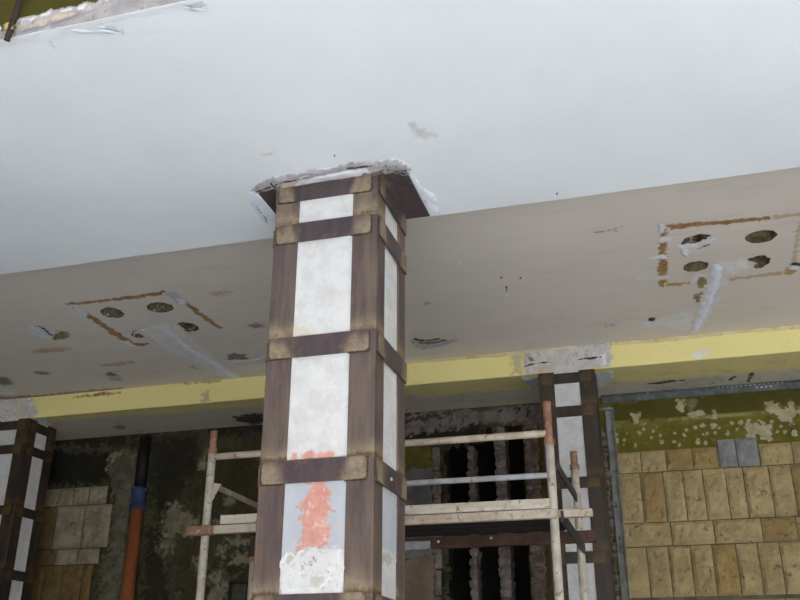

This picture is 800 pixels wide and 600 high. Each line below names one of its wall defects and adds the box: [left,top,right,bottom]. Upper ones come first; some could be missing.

spalling [0,0,211,49]
spalling [249,157,413,193]
rust [653,211,800,288]
rust [62,289,167,348]
rust [183,300,225,331]
spalling [409,336,460,350]
water stain [609,388,800,428]
flaking render [289,445,337,460]
water stain [47,424,263,535]
flaking render [280,481,339,568]
spalling [307,569,330,594]